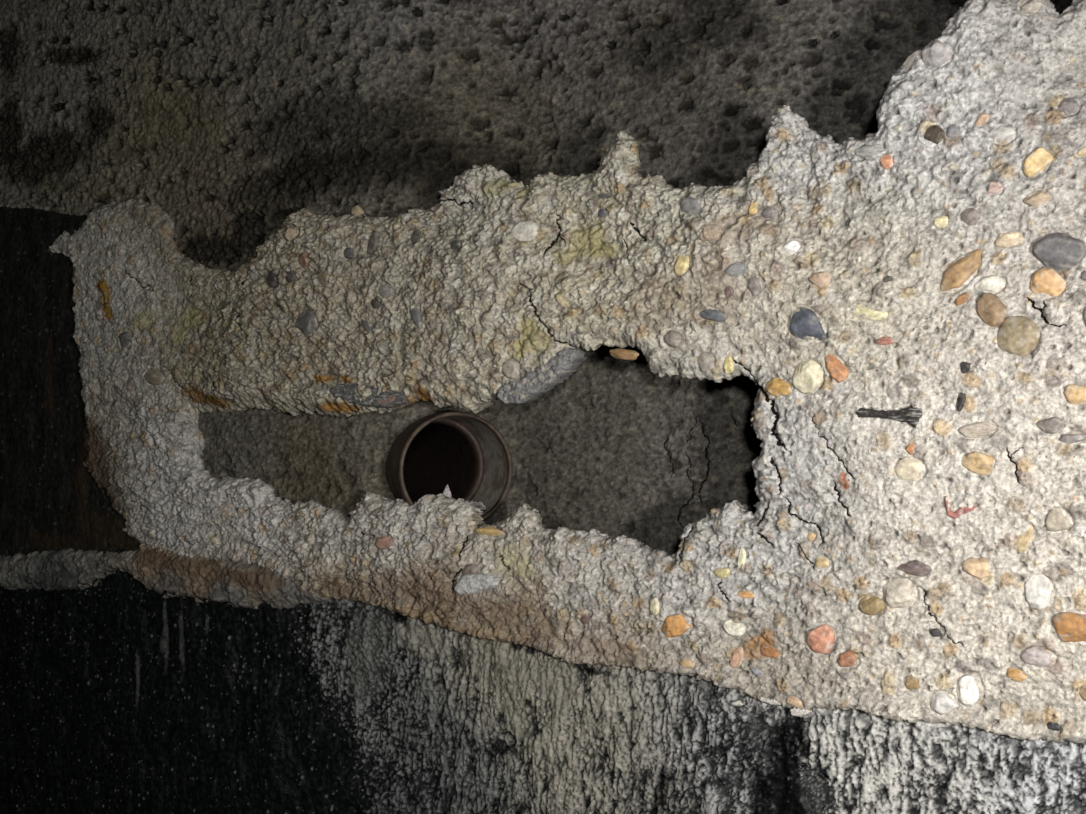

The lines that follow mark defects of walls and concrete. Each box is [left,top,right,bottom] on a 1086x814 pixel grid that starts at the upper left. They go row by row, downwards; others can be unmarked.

damp [0,101,86,185]
damp [184,100,528,266]
crack [543,214,566,254]
rust [97,280,112,319]
crack [520,283,576,347]
crack [1026,297,1067,327]
peeling [329,384,408,408]
peeling [496,347,586,403]
crack [734,360,824,570]
crack [812,414,855,517]
peeling [454,573,503,595]
peeling [790,708,812,717]